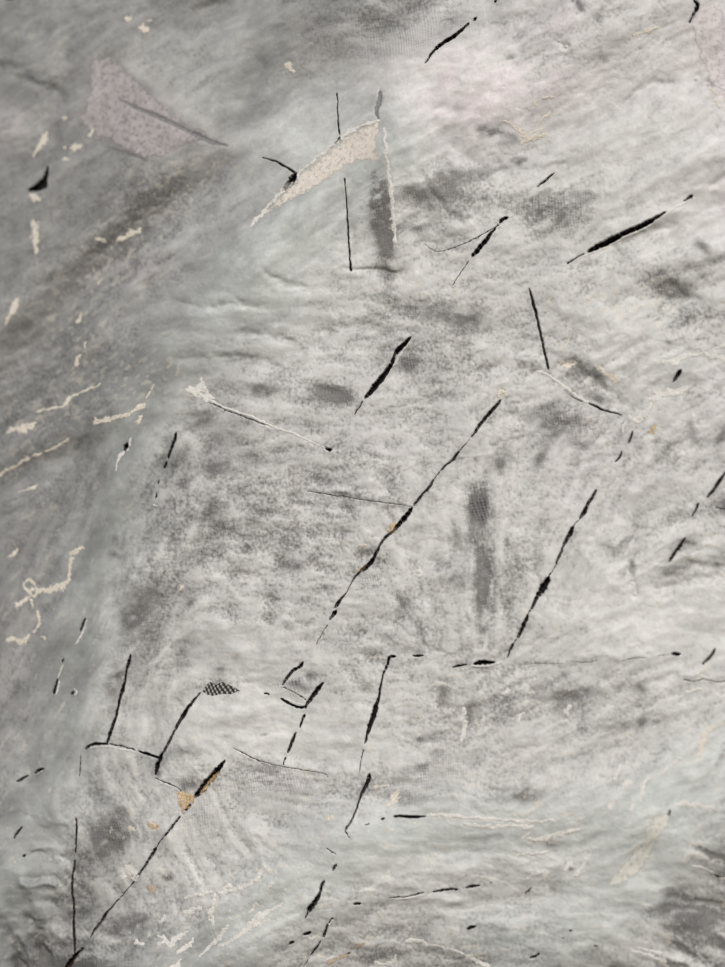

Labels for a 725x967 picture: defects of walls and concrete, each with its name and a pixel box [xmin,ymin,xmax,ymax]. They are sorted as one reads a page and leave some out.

crack [425,17,477,63]
crack [689,0,699,23]
peeling [250,90,397,244]
crack [423,214,513,285]
crack [567,195,693,264]
crack [354,337,412,415]
crack [529,288,633,462]
crack [669,472,725,562]
crack [450,490,597,669]
crack [65,393,501,967]